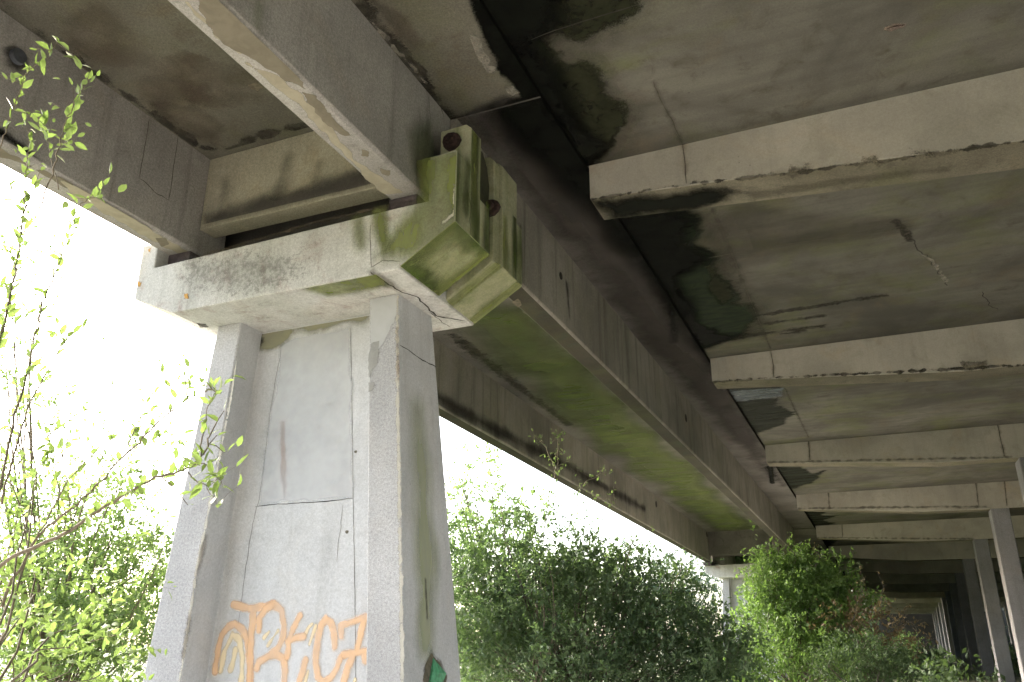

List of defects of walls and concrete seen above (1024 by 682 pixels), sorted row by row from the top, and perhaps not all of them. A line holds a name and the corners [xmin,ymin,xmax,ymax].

water stain [62,51,308,150]
peeling [185,0,403,194]
crack [653,82,687,183]
spalling [691,141,1024,184]
crack [370,225,464,327]
water stain [355,0,888,489]
crack [891,219,949,285]
spalling [710,362,1024,384]
water stain [438,394,645,511]